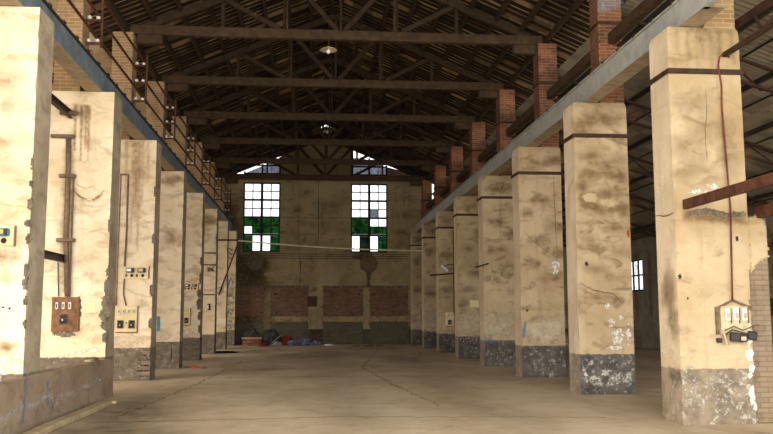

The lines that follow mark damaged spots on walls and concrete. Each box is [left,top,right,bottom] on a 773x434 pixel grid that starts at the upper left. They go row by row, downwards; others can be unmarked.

flaking render [24,198,33,244]
flaking render [21,261,31,305]
flaking render [47,265,151,377]
peeling [604,303,632,350]
flaking render [685,207,773,423]
efflorescence [572,356,631,387]